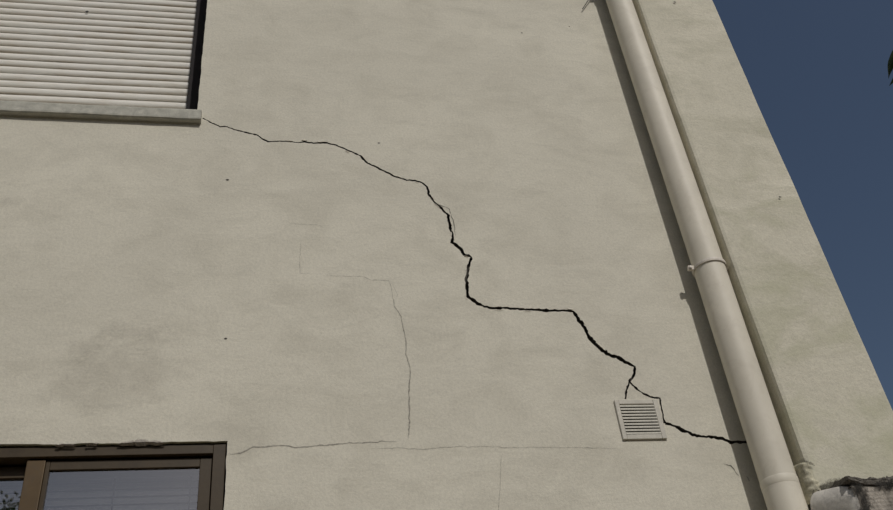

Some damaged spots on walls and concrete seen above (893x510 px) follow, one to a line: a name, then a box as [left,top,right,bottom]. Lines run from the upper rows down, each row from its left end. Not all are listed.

crack [202,118,747,444]